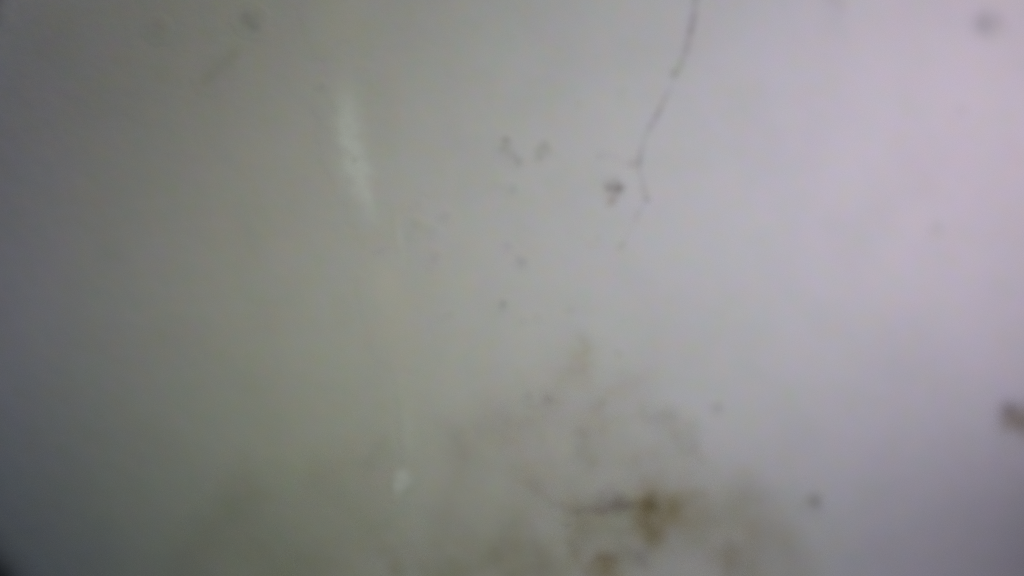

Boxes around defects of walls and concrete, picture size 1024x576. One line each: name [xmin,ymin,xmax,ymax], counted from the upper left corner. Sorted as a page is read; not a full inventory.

crack [635,0,702,205]
leakage [395,315,836,576]